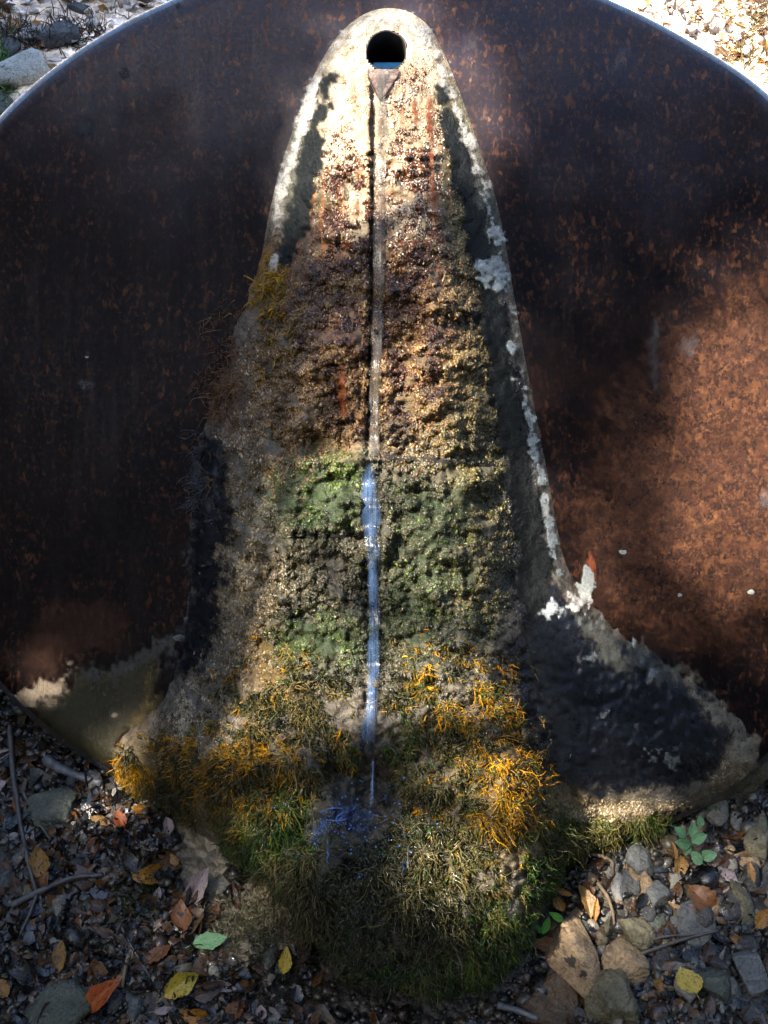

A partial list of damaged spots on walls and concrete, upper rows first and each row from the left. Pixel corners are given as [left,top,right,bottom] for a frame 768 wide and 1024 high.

rust [413,98,436,207]
leakage [313,316,369,358]
leakage [430,464,465,490]
rust [563,272,768,659]
leakage [317,529,373,602]
leakage [406,625,430,650]
leakage [451,818,558,937]